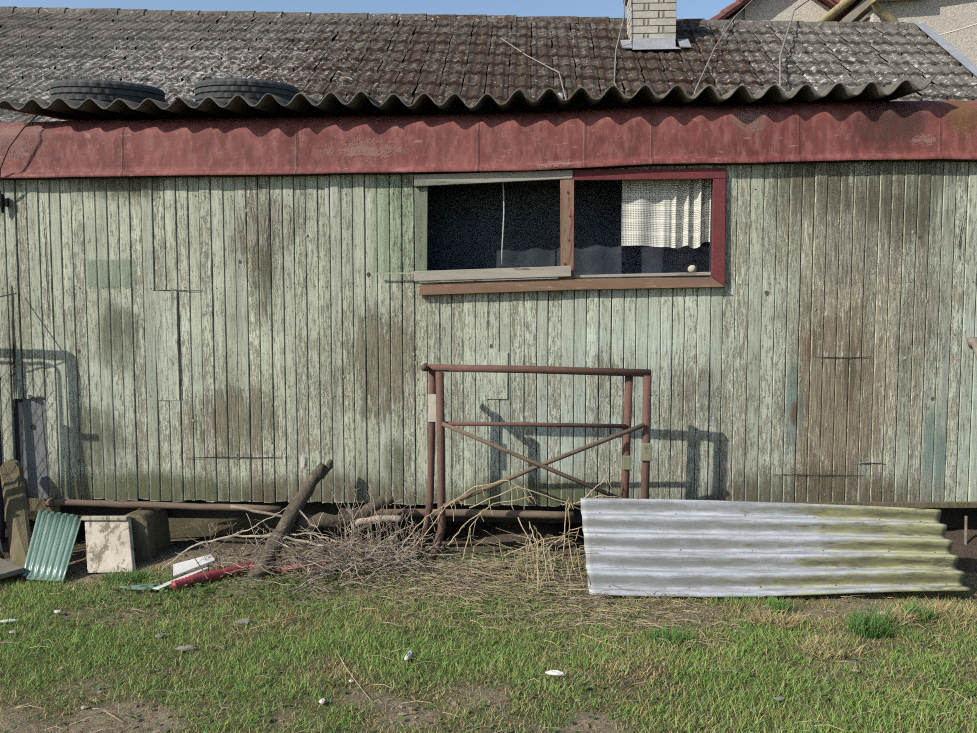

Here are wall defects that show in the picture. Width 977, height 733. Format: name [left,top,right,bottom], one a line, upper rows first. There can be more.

peeling [228,196,310,259]
peeling [564,191,572,265]
peeling [340,302,418,429]
peeling [779,188,922,496]
peeling [896,281,956,374]
peeling [187,386,279,465]